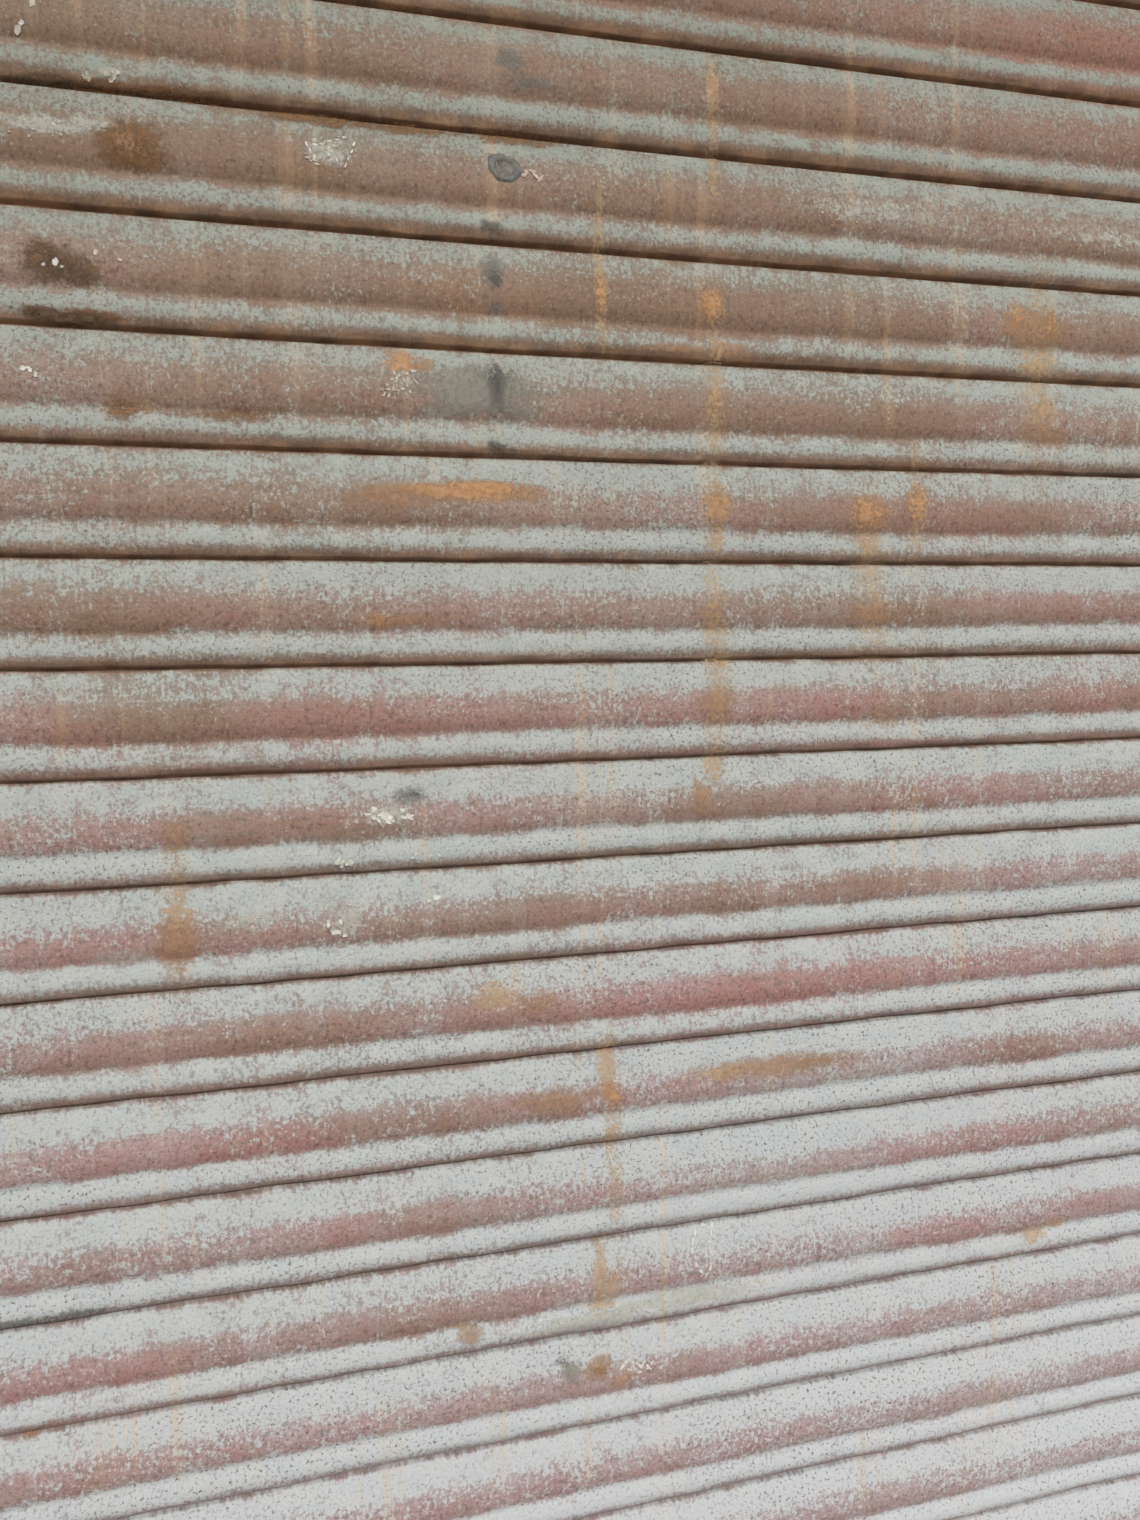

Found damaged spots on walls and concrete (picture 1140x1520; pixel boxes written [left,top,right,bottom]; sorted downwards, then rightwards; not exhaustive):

rust [94,119,165,172]
rust [23,240,100,287]
rust [699,289,723,324]
rust [361,479,544,509]
rust [852,496,890,530]